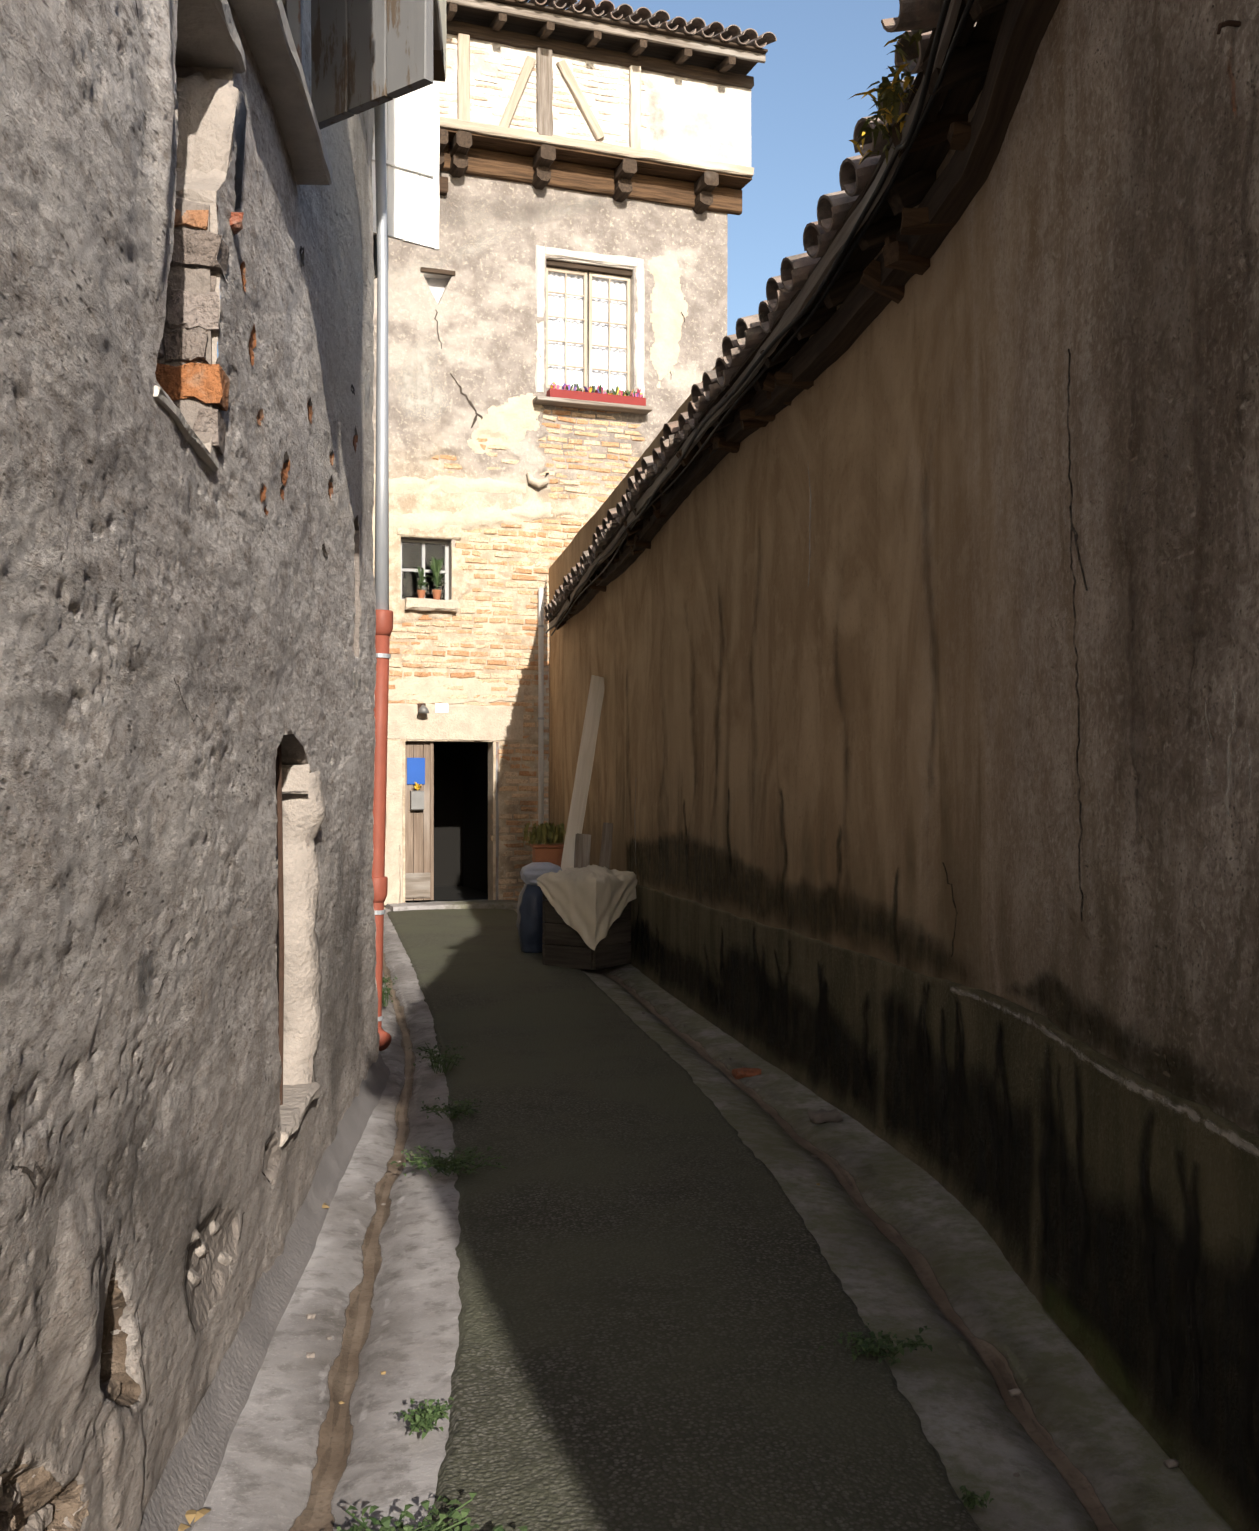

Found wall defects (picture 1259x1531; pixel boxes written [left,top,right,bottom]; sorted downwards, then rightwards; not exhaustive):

spalling [260,451,290,516]
crack [434,309,483,428]
peeling [467,393,544,454]
leakage [626,790,975,1151]
spalling [183,1204,241,1337]
leakage [606,964,1119,1531]
leakage [1014,978,1259,1413]
spalling [100,1273,141,1409]
spalling [0,1462,90,1531]